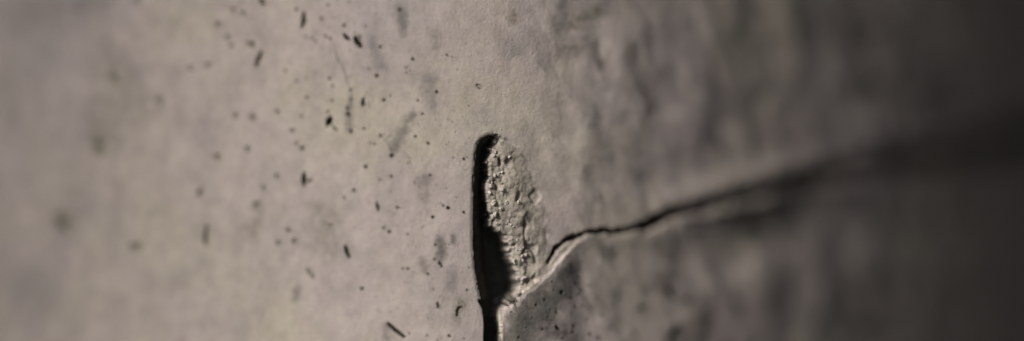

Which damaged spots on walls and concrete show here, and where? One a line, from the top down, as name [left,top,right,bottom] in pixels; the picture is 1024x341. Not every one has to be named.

spalling [483,139,549,300]
crack [472,122,1024,341]